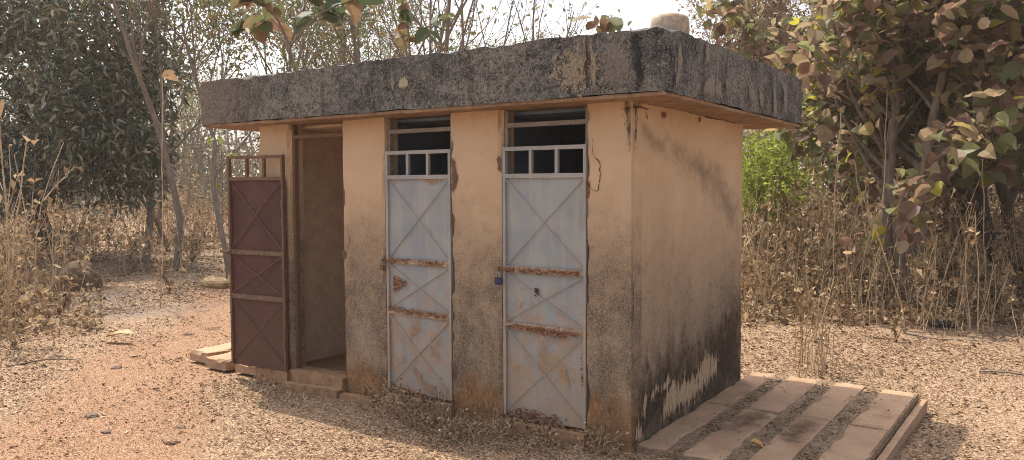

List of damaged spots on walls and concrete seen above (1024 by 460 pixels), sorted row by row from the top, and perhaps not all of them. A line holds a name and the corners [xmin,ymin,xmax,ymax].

leakage [675,44,683,88]
leakage [595,32,646,138]
leakage [749,83,787,113]
corrosion [389,256,444,268]
corrosion [505,266,581,278]
corrosion [388,277,448,343]
corrosion [504,322,582,340]
leakage [631,305,741,454]
corrosion [506,404,587,433]